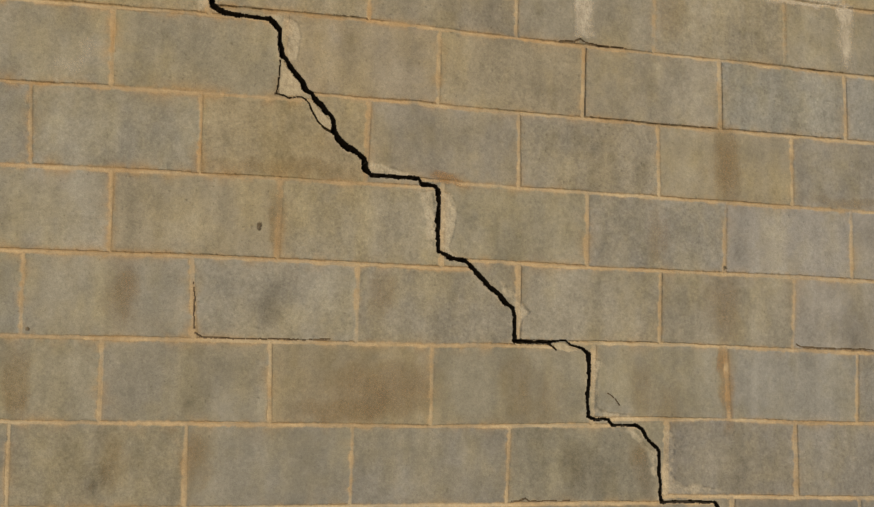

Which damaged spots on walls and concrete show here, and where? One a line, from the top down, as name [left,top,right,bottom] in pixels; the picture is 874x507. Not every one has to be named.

crack [193,0,720,507]